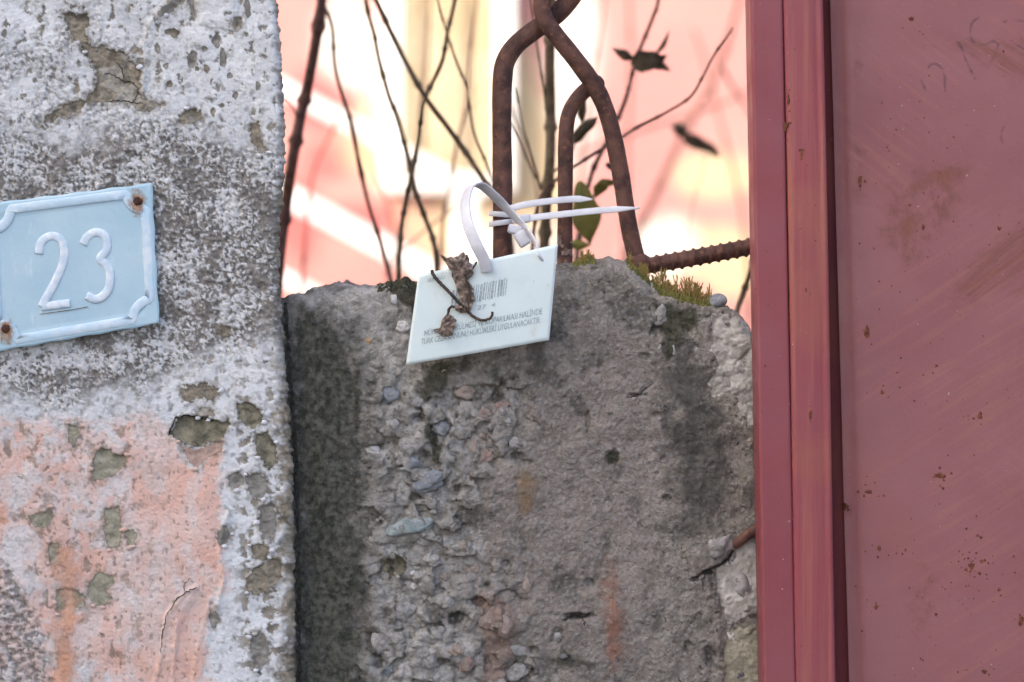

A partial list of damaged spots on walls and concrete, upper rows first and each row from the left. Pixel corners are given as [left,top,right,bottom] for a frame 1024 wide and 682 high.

spalling [44,12,166,123]
crack [104,63,143,104]
spalling [28,504,54,528]
spalling [88,446,131,481]
spalling [103,506,137,552]
spalling [170,382,282,596]
leakage [290,305,370,682]
leakage [663,340,730,532]
spalling [51,572,116,617]
crack [160,579,197,653]
spalling [246,630,271,673]
corrosion [951,527,994,616]